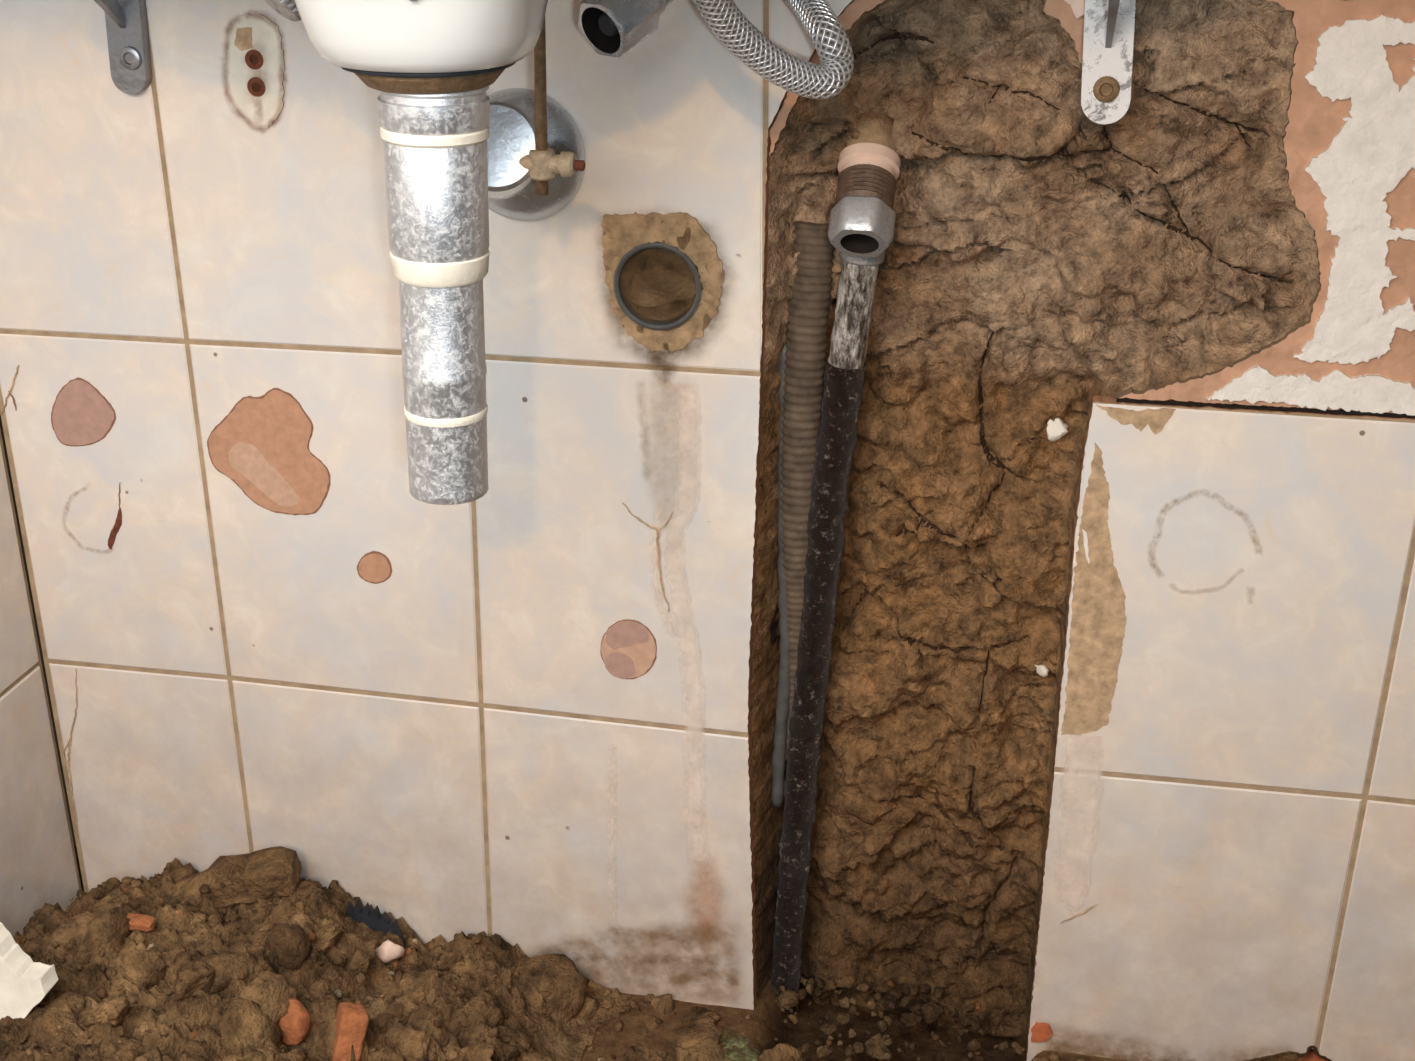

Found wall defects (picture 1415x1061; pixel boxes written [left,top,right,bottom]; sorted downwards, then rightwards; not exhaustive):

crack [853,32,934,60]
crack [963,77,1060,110]
crack [1135,83,1271,147]
crack [911,125,1283,282]
crack [880,331,1023,592]
spalling [751,0,1415,1044]
water stain [653,388,704,861]
crack [769,602,780,649]
crack [843,588,1026,721]
crack [875,766,1019,949]